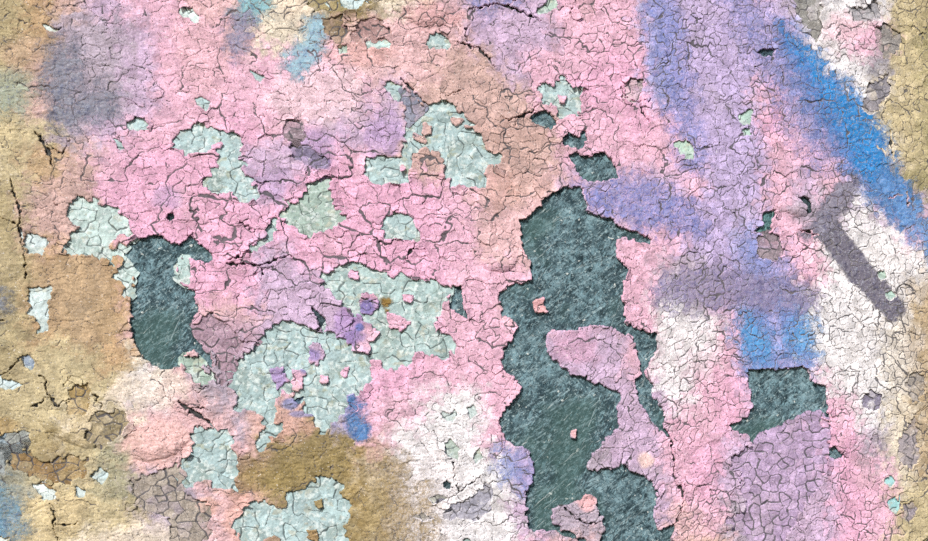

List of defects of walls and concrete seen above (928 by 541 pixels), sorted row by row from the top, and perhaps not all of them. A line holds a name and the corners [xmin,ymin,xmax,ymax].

crack [458,0,539,67]
crack [35,132,71,166]
peeling [161,97,266,206]
peeling [362,80,506,195]
crack [507,105,538,125]
crack [226,255,292,275]
spalling [491,75,675,541]
peeling [18,195,478,541]
crack [178,400,210,424]
peeling [429,480,493,521]
crack [668,436,688,522]
peeling [725,366,849,541]